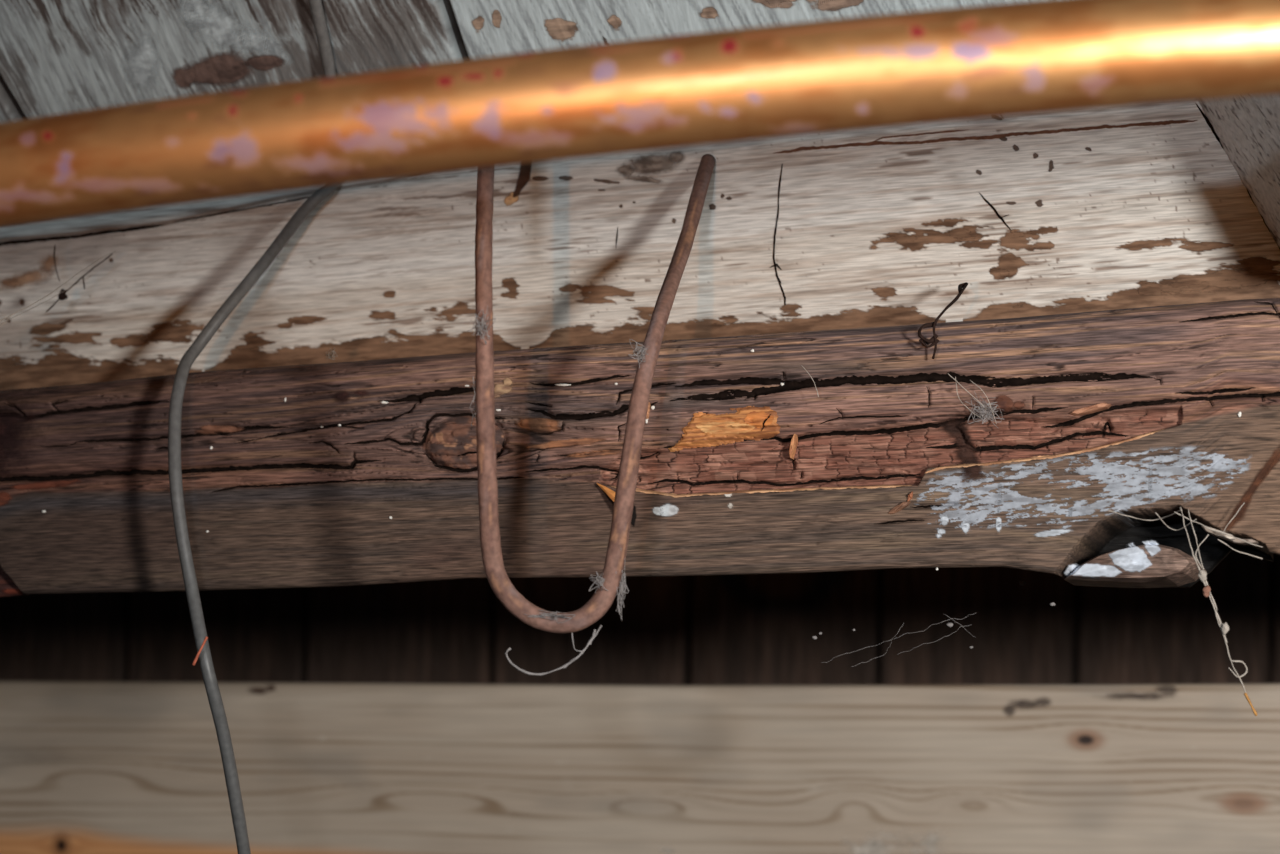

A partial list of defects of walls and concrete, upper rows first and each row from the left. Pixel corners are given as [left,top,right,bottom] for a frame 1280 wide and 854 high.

water stain [2,256,56,287]
crack [0,372,1280,524]
peeling [695,411,774,434]
water stain [941,418,982,480]